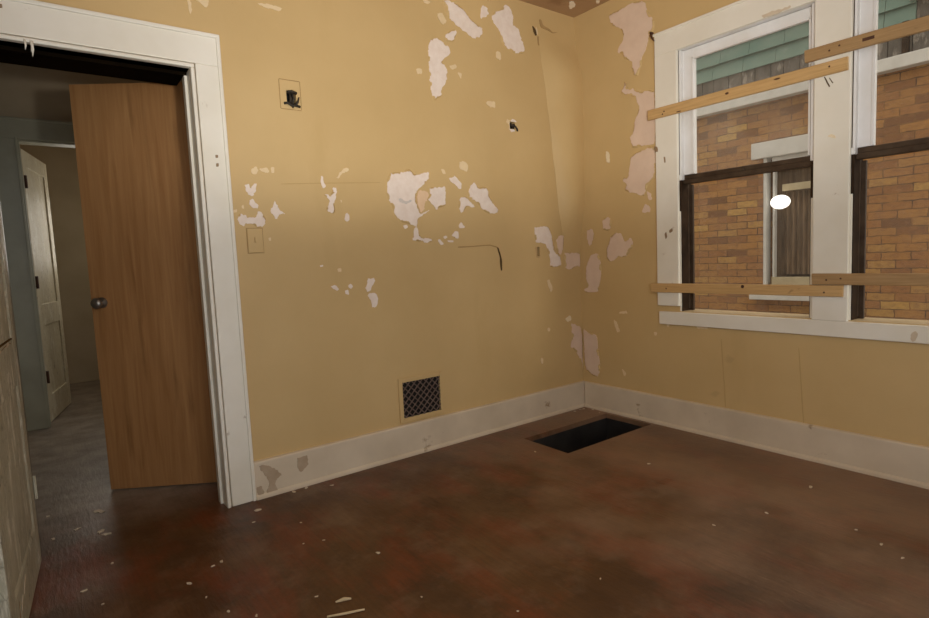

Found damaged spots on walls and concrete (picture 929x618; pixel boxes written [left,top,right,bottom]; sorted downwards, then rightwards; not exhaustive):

peeling [416,0,525,100]
peeling [609,1,655,76]
peeling [622,82,666,213]
peeling [233,166,285,228]
peeling [320,168,350,221]
peeling [386,161,498,245]
peeling [534,217,633,292]
peeling [565,316,601,376]
peeling [257,465,281,495]